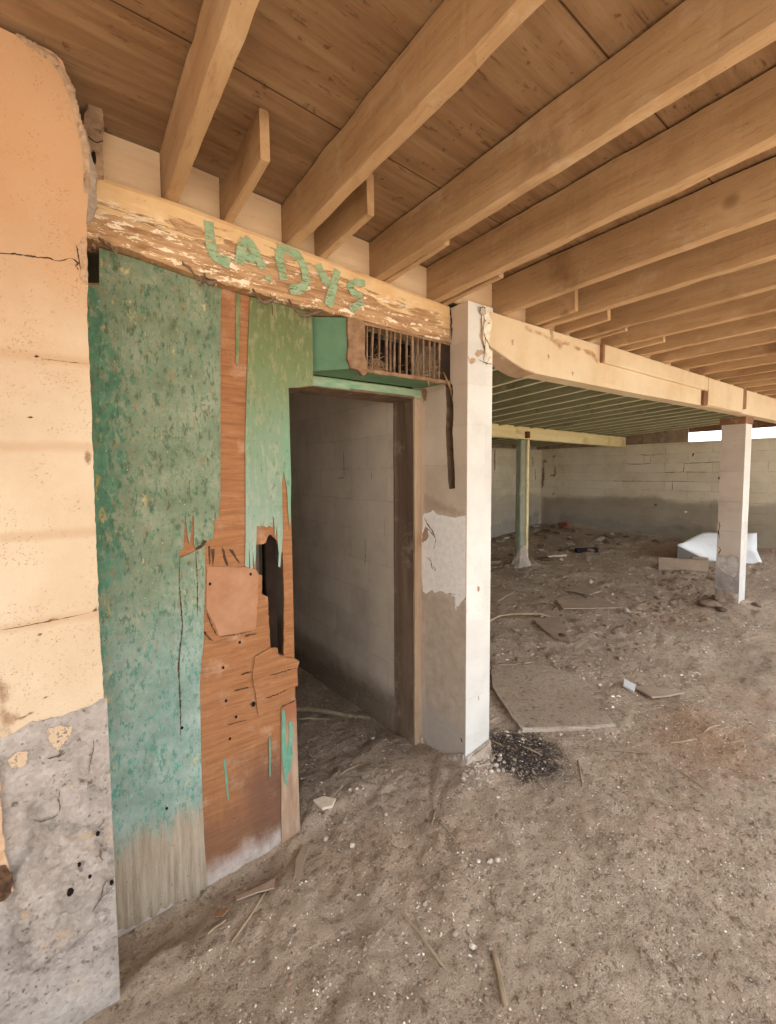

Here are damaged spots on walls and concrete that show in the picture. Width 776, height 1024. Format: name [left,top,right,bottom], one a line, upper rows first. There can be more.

crack [0,253,79,270]
peeling [422,510,466,610]
peeling [0,698,120,1024]